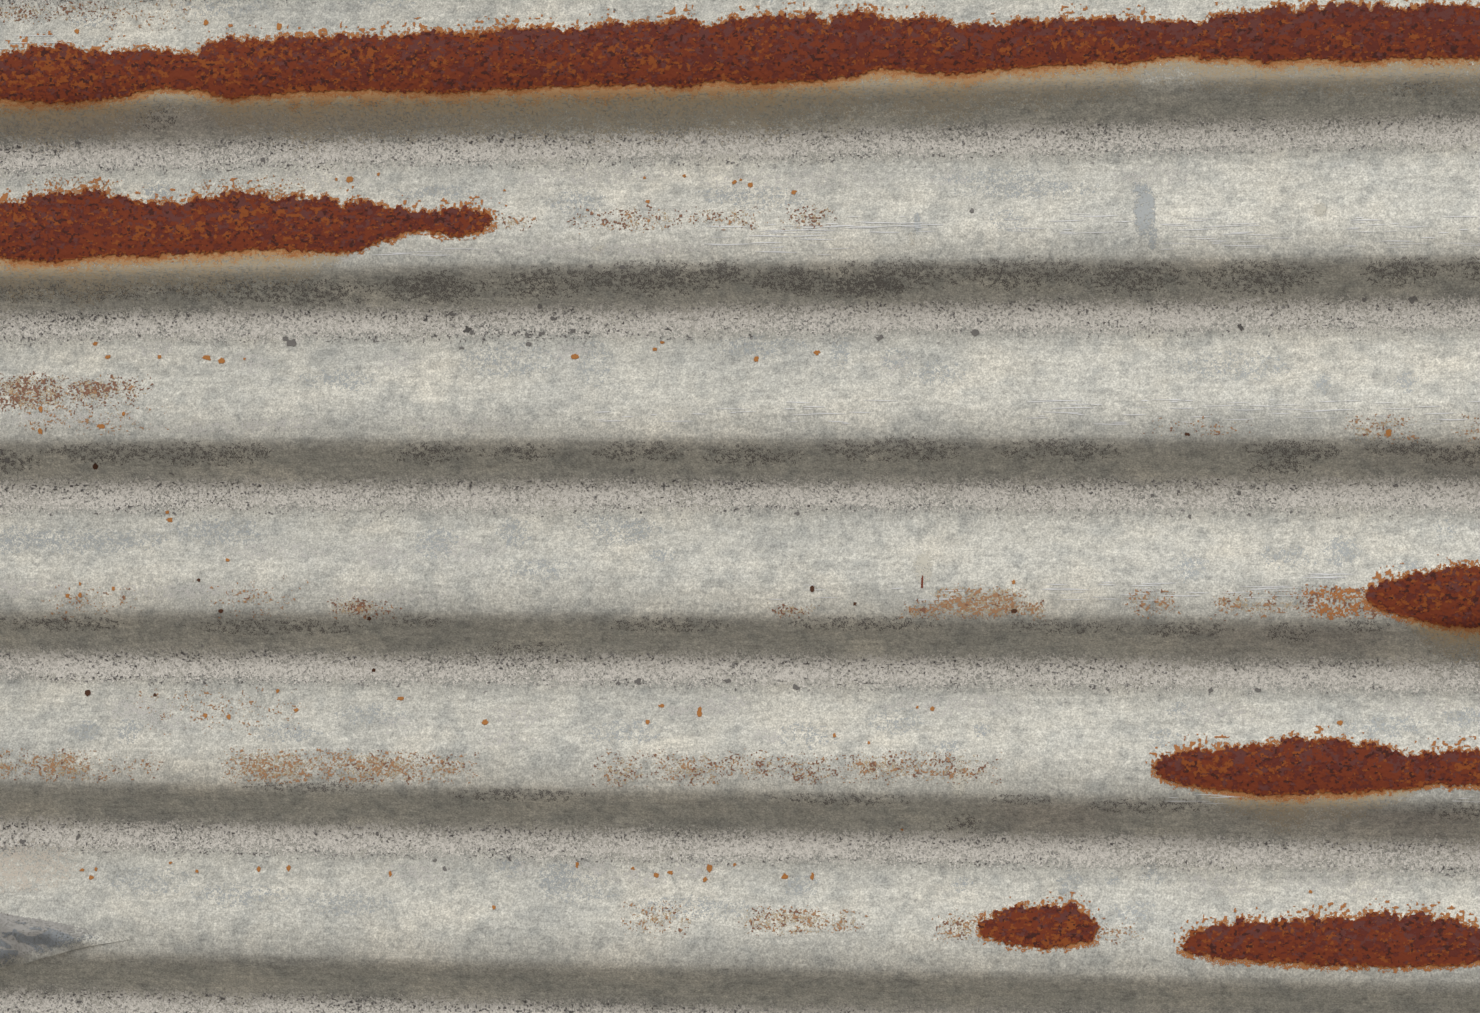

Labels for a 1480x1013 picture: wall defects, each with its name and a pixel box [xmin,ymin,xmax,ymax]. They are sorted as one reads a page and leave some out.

rust [0,0,1480,110]
rust [0,174,537,268]
rust [1210,554,1480,635]
rust [1145,720,1480,803]
rust [932,891,1144,954]
rust [1173,890,1480,973]